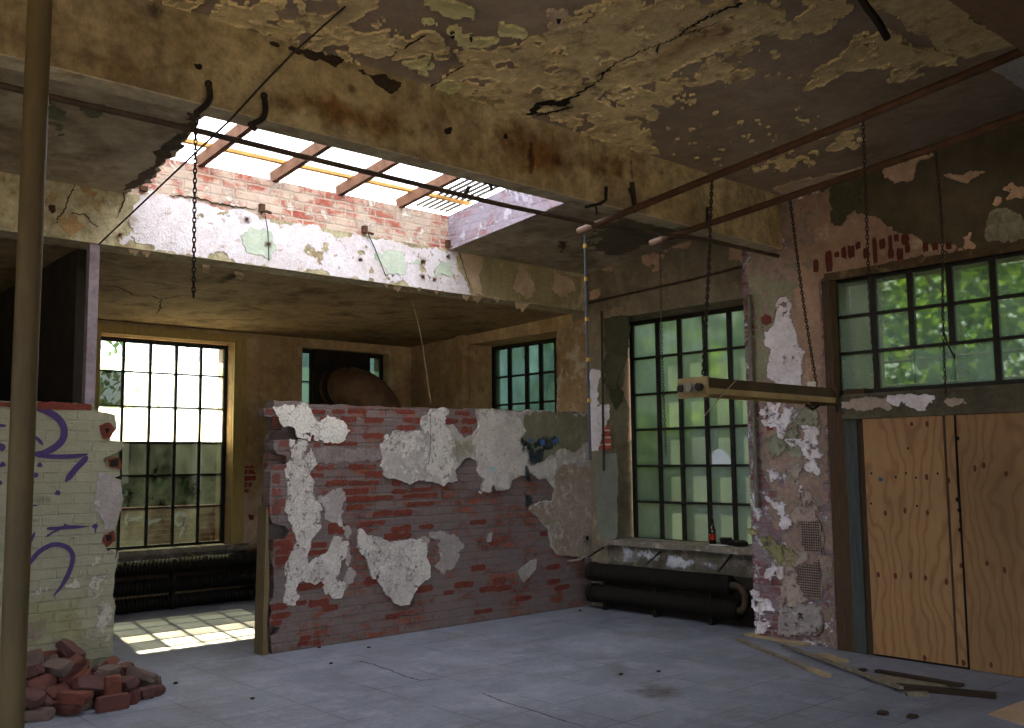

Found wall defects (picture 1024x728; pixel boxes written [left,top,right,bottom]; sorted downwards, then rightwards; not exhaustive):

damp [319,96,396,134]
crack [526,2,743,116]
peeling [119,0,1024,387]
peeling [66,457,123,641]
spalling [99,422,115,439]
peeling [265,357,631,626]
peeling [759,402,824,482]
peeling [746,528,837,647]
peeling [765,489,819,530]
peeling [841,393,967,411]